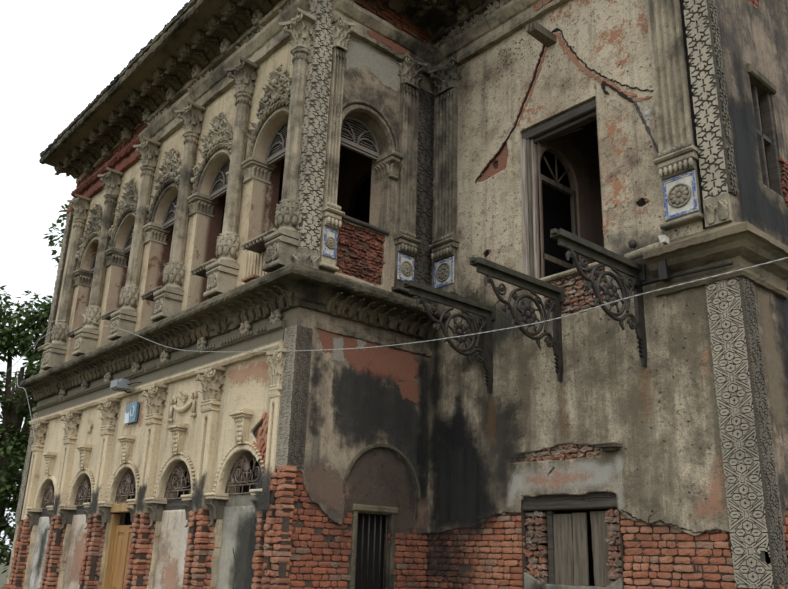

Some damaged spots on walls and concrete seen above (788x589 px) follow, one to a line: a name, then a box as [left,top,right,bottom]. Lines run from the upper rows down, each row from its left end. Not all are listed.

spalling [354,0,431,44]
peeling [588,4,648,77]
crack [475,28,659,182]
peeling [602,163,652,235]
flaking render [314,327,420,404]
damp [311,340,622,535]
spalling [513,444,601,463]
flaking render [251,411,353,589]
flaking render [384,500,529,589]
flaking render [620,511,761,589]